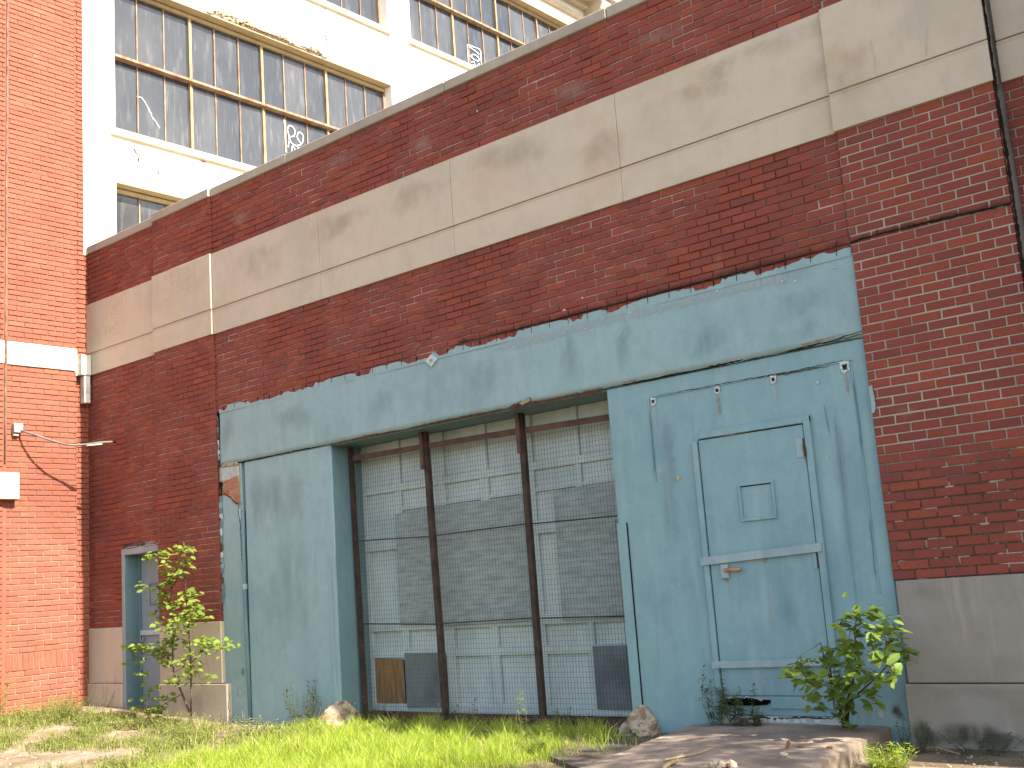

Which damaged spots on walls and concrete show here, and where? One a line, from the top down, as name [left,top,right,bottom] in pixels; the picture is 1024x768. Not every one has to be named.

crack [467,0,1024,342]
spalling [506,397,536,410]
flaking render [217,416,242,604]